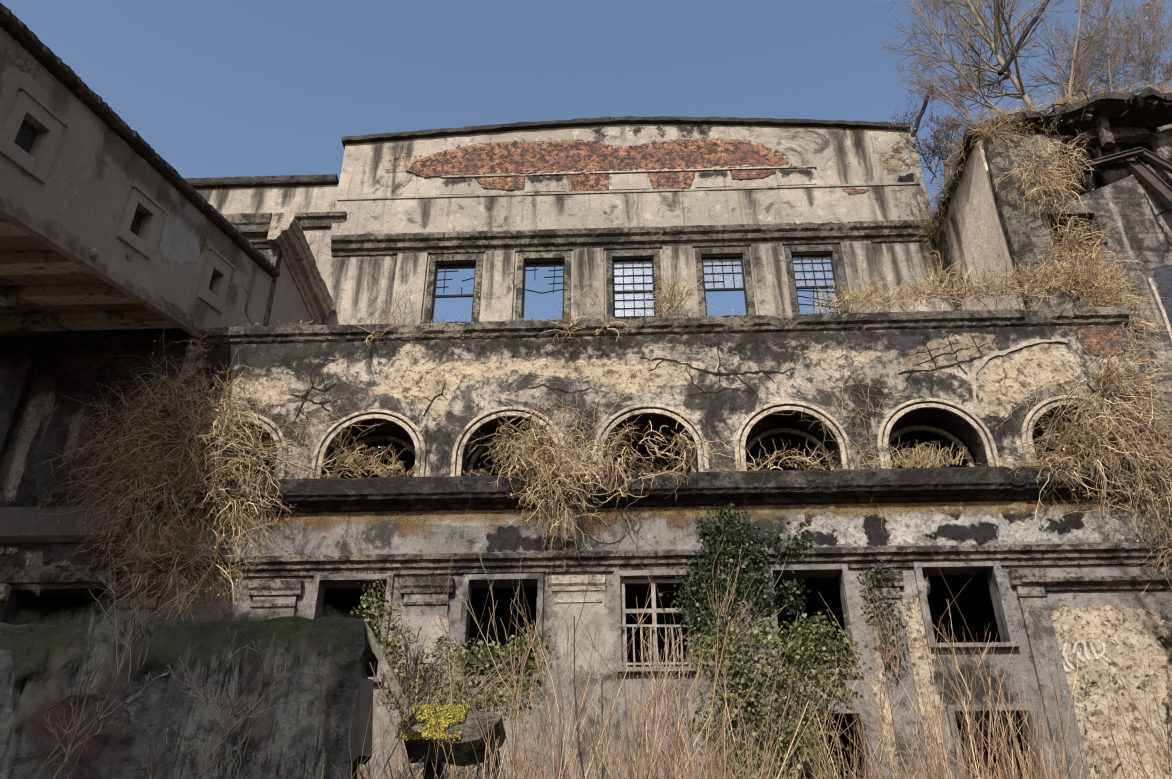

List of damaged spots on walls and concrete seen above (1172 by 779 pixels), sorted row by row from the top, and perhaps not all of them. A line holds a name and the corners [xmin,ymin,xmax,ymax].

leakage [633,124,713,138]
leakage [373,142,413,193]
leakage [443,178,472,187]
leakage [527,175,565,183]
spalling [405,137,792,191]
leakage [699,170,728,178]
leakage [778,169,812,205]
leakage [830,129,887,220]
leakage [1098,150,1143,256]
crack [638,333,796,395]
spalling [904,325,1126,419]